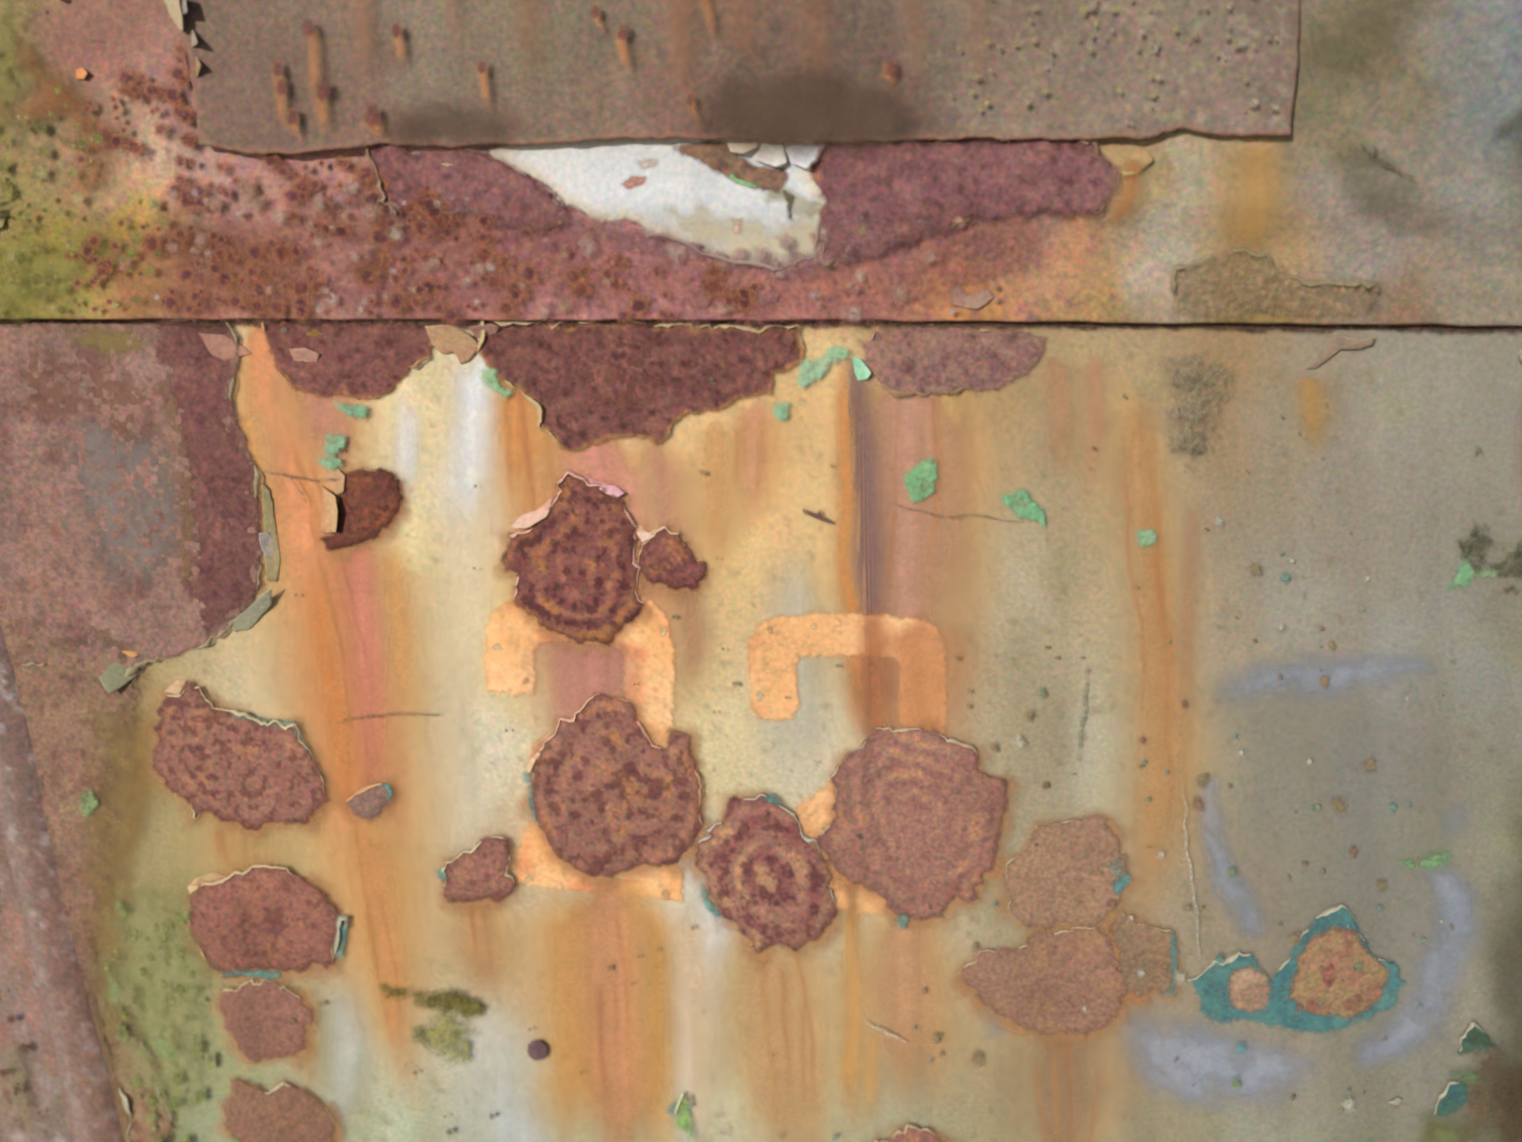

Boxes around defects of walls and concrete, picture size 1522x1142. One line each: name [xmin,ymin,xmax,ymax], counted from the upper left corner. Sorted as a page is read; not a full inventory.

corrosion [303,20,330,120]
corrosion [479,62,487,97]
corrosion [617,24,629,63]
peeling [483,137,827,271]
corrosion [331,105,1121,278]
corrosion [1171,249,1380,318]
peeling [280,327,322,362]
peeling [425,324,511,397]
corrosion [0,319,433,1142]
corrosion [477,320,1144,1128]
peeling [1167,904,1406,1033]
corrosion [874,1125,949,1142]